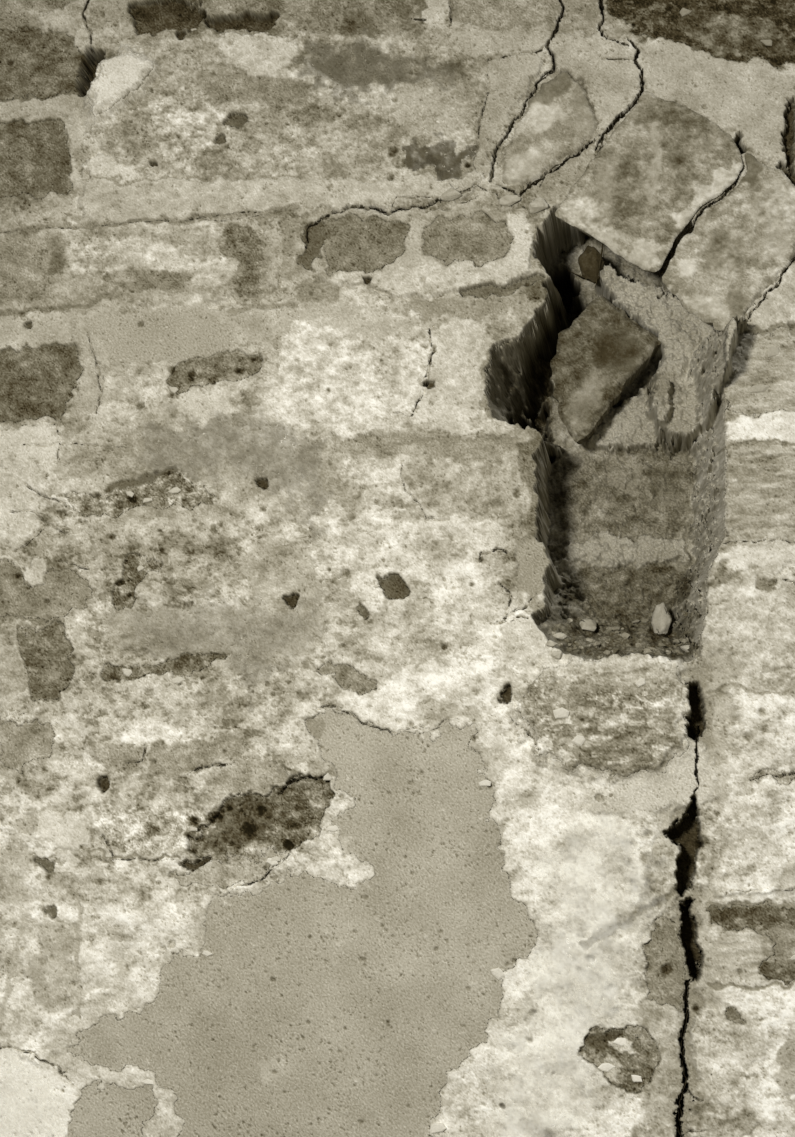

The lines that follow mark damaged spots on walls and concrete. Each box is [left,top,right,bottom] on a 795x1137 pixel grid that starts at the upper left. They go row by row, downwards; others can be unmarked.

crack [82,0,93,53]
crack [305,0,645,249]
crack [1,208,283,233]
crack [659,182,735,277]
crack [747,257,795,322]
spalling [484,233,795,663]
crack [693,726,701,791]
peeling [67,709,538,1137]
spalling [579,1026,660,1093]
crack [676,982,709,1137]